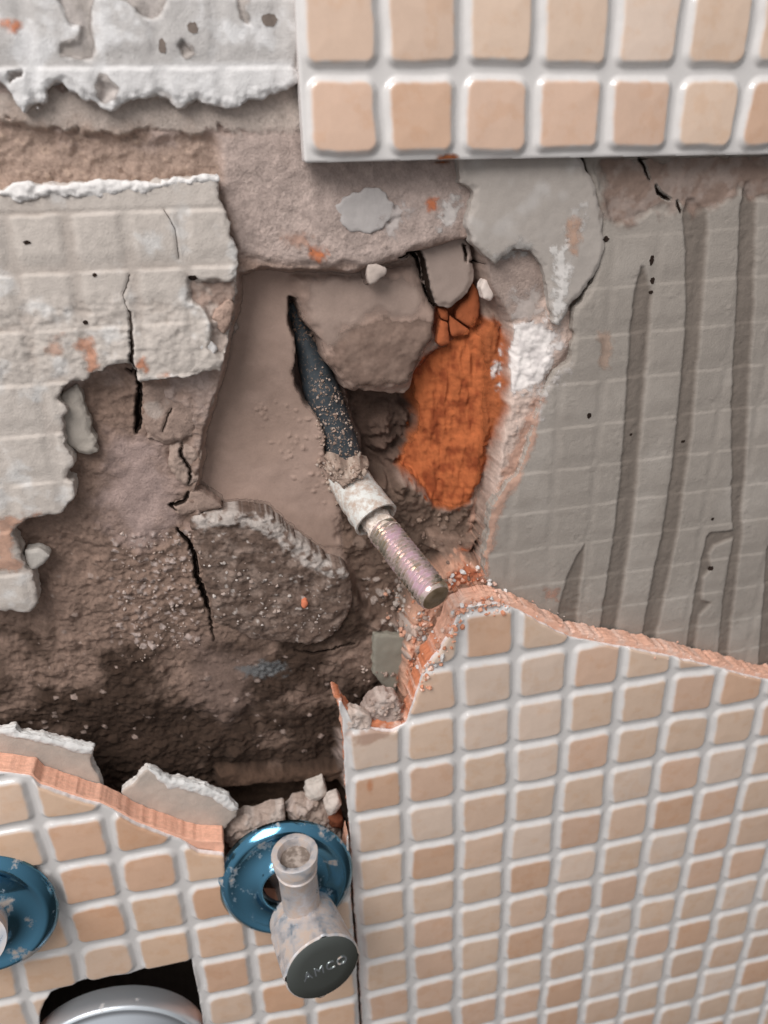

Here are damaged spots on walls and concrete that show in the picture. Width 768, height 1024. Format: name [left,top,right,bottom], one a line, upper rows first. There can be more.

peeling [59,0,94,60]
peeling [125,0,165,17]
peeling [237,0,250,23]
peeling [95,73,119,103]
crack [639,158,681,212]
crack [398,251,436,307]
flaking render [477,278,494,301]
spalling [190,263,434,547]
flaking render [397,318,501,510]
crack [122,274,214,641]